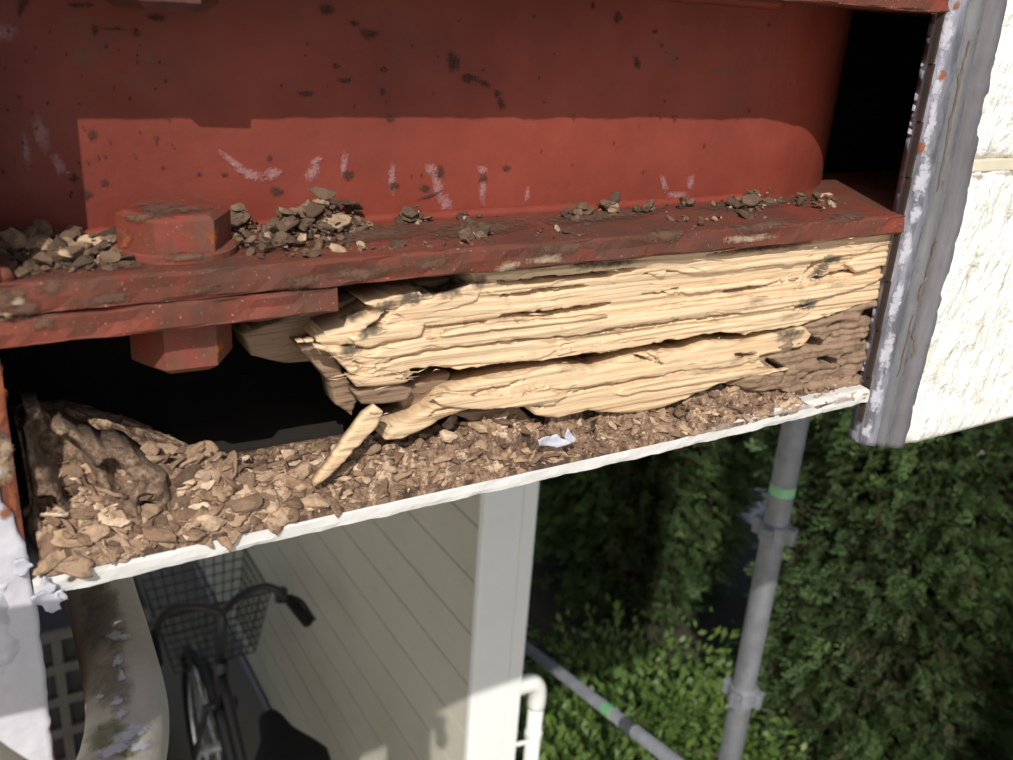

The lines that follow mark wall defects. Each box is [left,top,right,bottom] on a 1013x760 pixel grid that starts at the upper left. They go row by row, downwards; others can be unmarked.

peeling [0,439,15,484]